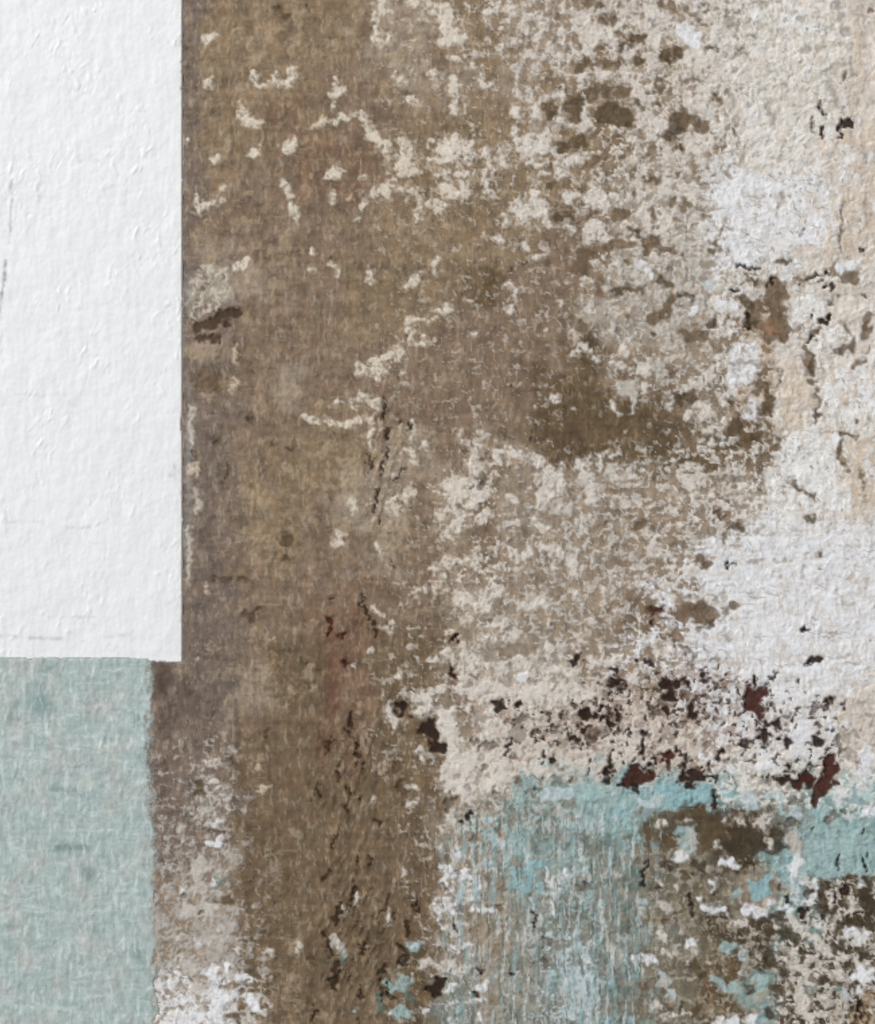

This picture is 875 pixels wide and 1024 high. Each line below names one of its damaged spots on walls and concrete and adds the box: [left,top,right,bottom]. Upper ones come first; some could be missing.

peeling [182,0,875,1024]
rust [646,604,669,627]
rust [522,634,852,829]